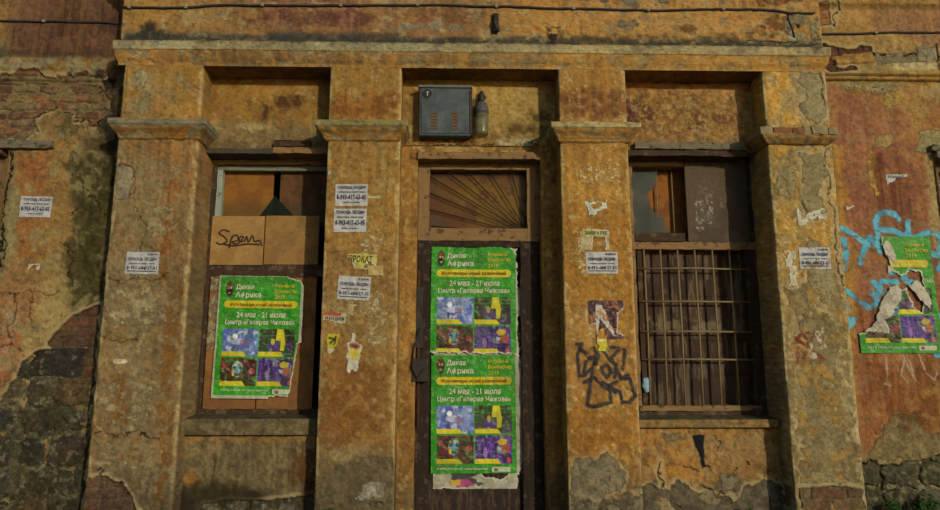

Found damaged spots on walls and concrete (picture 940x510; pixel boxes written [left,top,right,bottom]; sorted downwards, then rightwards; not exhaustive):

flaking render [0,67,114,140]
peeling [626,1,940,144]
flaking render [774,152,830,220]
flaking render [867,134,895,197]
flaking render [914,129,940,154]
flaking render [784,240,940,510]
flaking render [83,476,135,510]
flaking render [570,453,786,510]